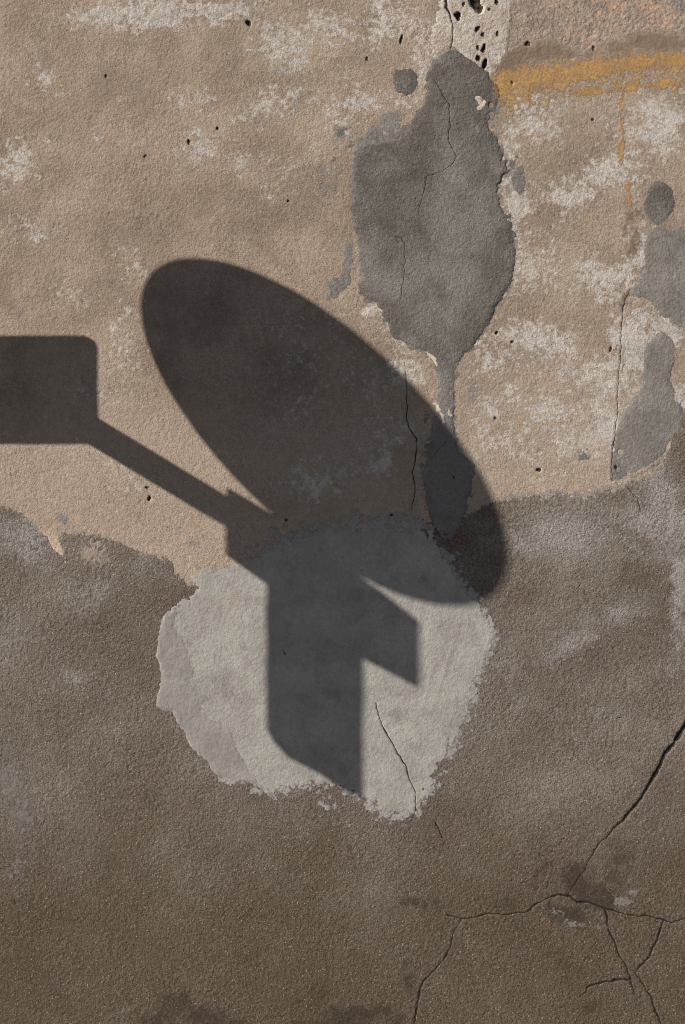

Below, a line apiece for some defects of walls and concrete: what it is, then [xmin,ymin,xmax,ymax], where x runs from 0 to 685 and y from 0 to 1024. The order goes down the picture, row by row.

rust [490,42,685,165]
crack [404,364,447,505]
crack [611,292,641,512]
peeling [600,442,671,487]
crack [376,703,443,838]
crack [413,723,685,1024]